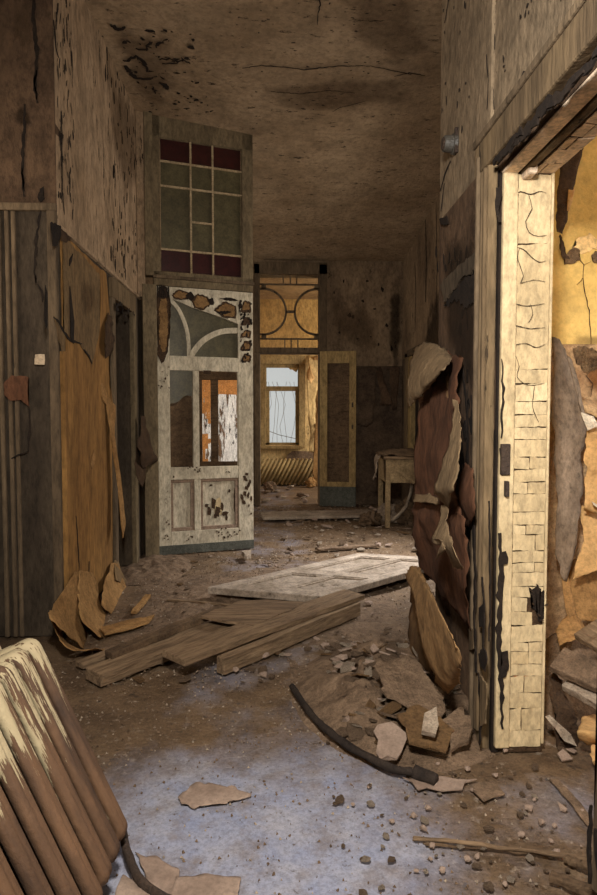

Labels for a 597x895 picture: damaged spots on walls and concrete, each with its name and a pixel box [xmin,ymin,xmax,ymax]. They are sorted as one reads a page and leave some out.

peeling [105,24,214,280]
crack [242,65,425,77]
spalling [559,235,597,265]
crack [509,111,597,747]
peeling [469,501,509,745]